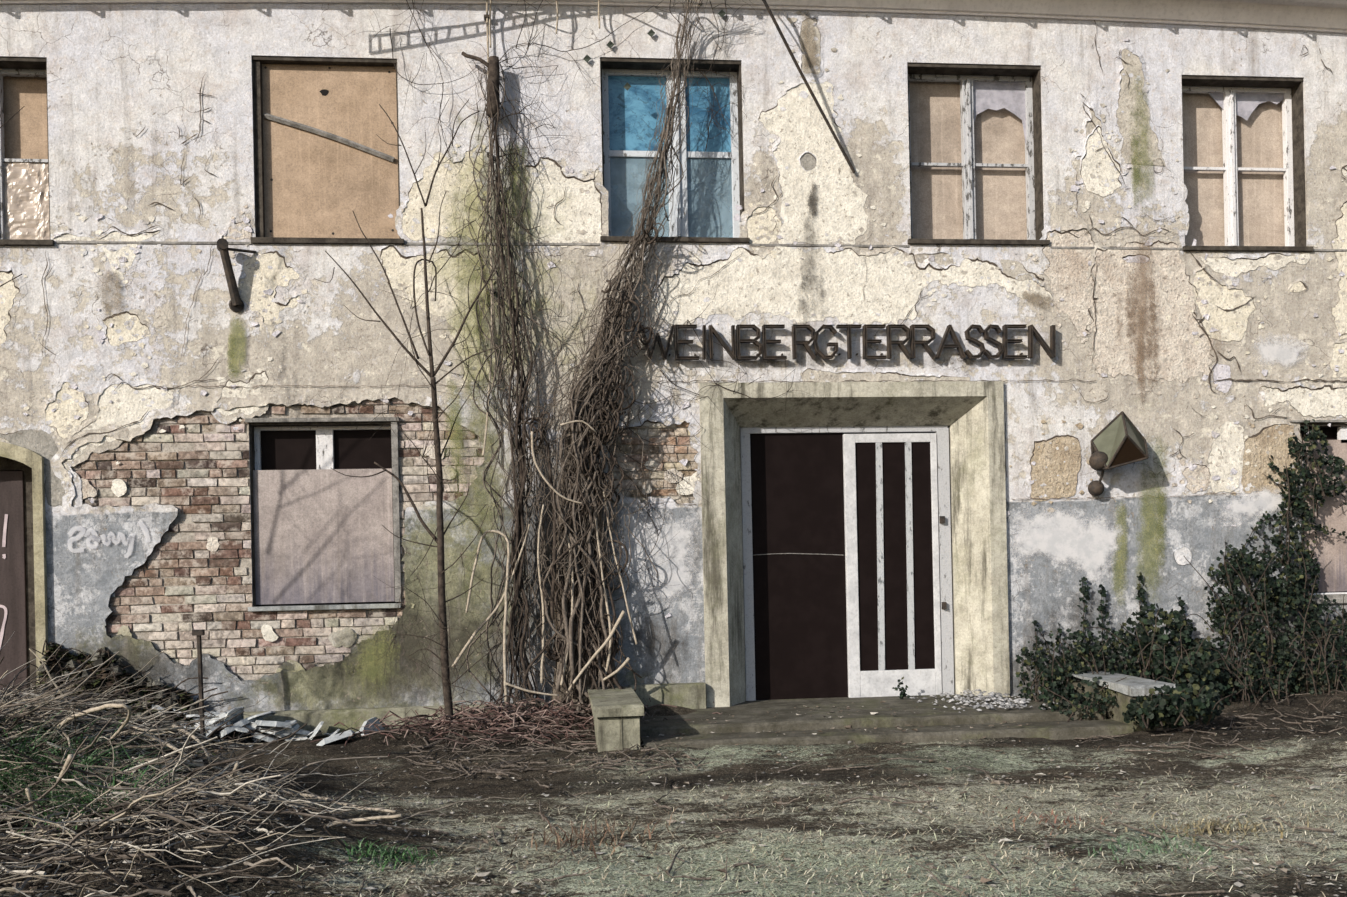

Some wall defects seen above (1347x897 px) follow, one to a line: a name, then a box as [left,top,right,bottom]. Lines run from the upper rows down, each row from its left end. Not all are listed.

spalling [0,140,621,694]
spalling [599,402,702,518]
peeling [644,11,1347,515]
crack [659,20,1347,529]
water stain [1006,511,1121,580]
water stain [1222,490,1288,526]